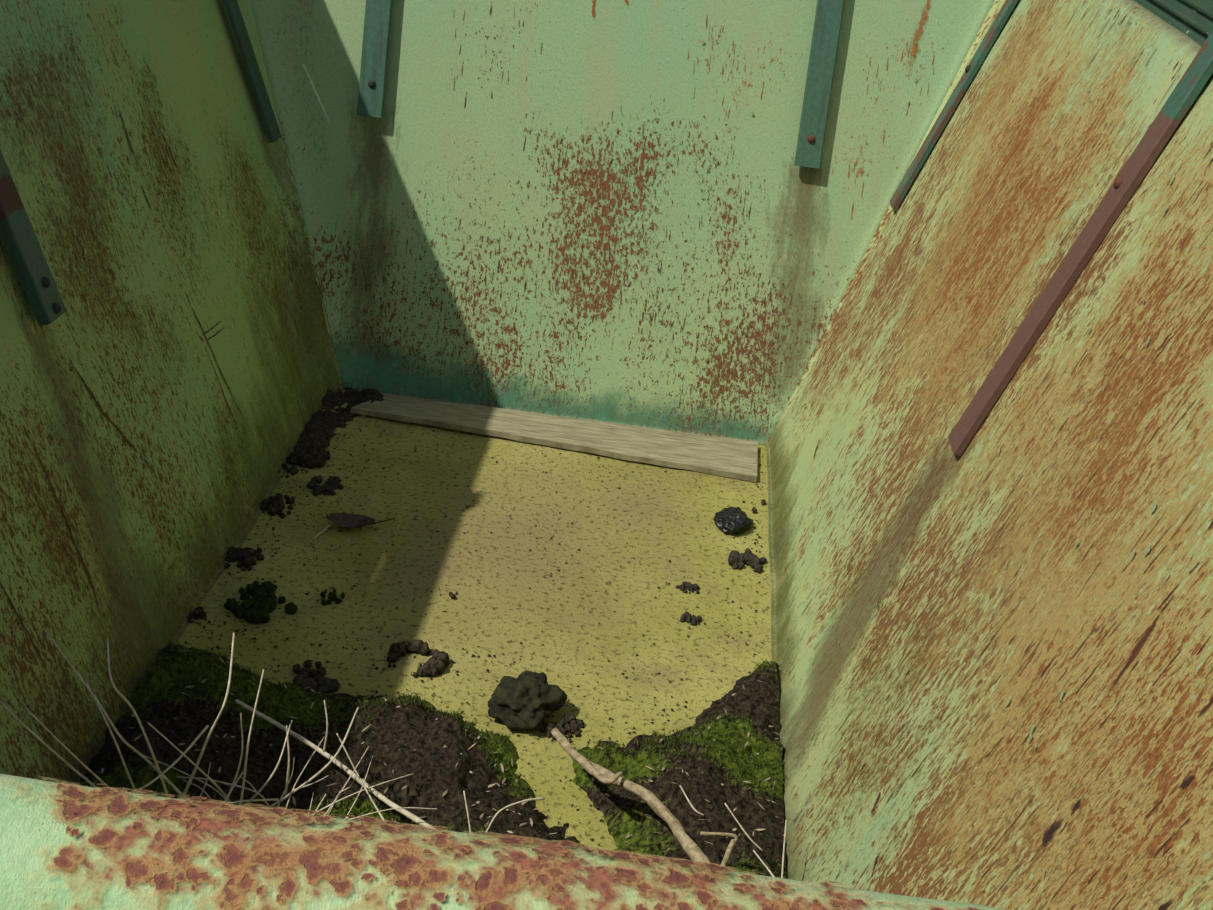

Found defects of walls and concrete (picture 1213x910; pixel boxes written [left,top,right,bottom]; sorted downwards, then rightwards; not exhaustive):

rust [0,5,186,464]
rust [119,59,301,432]
rust [404,1,803,419]
rust [825,0,948,219]
rust [879,0,1169,468]
rust [0,421,125,680]
rust [808,123,1213,910]
peeling [1040,796,1084,847]